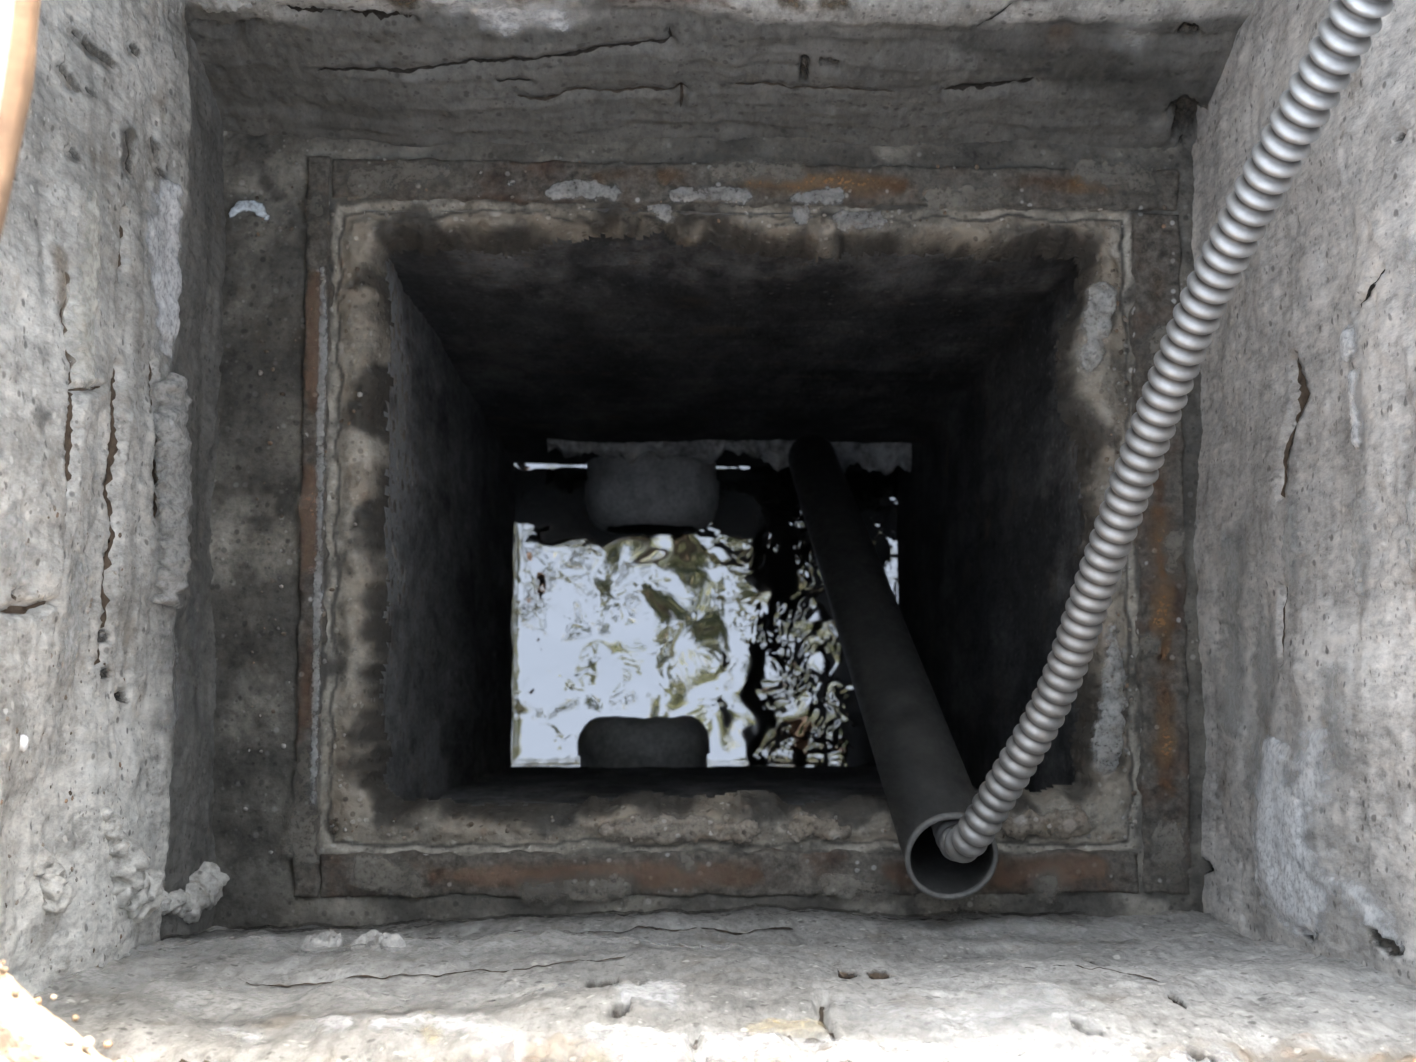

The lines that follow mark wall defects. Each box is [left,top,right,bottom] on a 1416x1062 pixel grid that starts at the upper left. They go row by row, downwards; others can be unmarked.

crack [287,5,413,20]
spalling [1177,22,1198,36]
crack [319,27,687,107]
crack [116,219,124,267]
crack [1280,358,1310,498]
crack [59,272,158,665]
crack [1281,587,1289,650]
crack [246,925,793,1001]
crack [1025,965,1159,982]